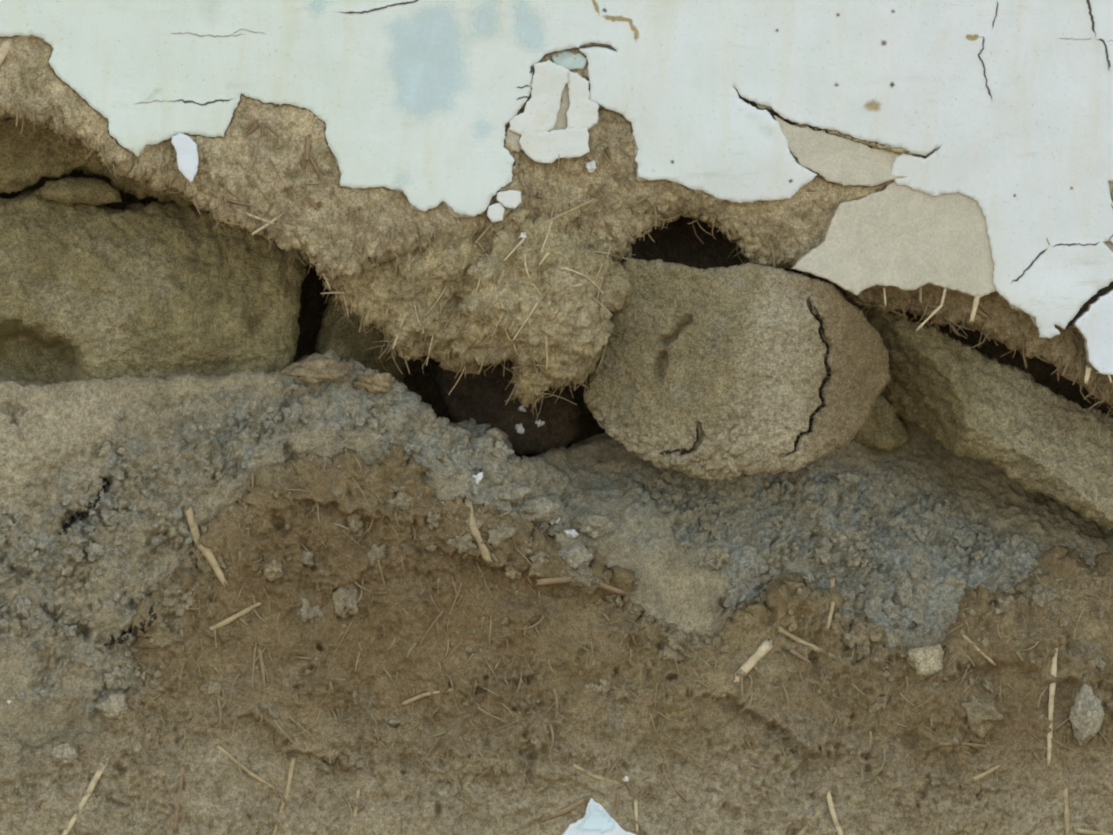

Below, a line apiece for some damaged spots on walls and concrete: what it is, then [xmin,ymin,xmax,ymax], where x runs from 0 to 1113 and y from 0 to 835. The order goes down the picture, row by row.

crack [172,29,265,37]
crack [340,0,418,14]
crack [978,2,998,99]
crack [1060,0,1113,69]
crack [136,98,231,106]
crack [738,95,877,149]
spalling [0,36,1113,421]
crack [1012,235,1113,281]
crack [1066,281,1113,329]
crack [782,300,831,457]